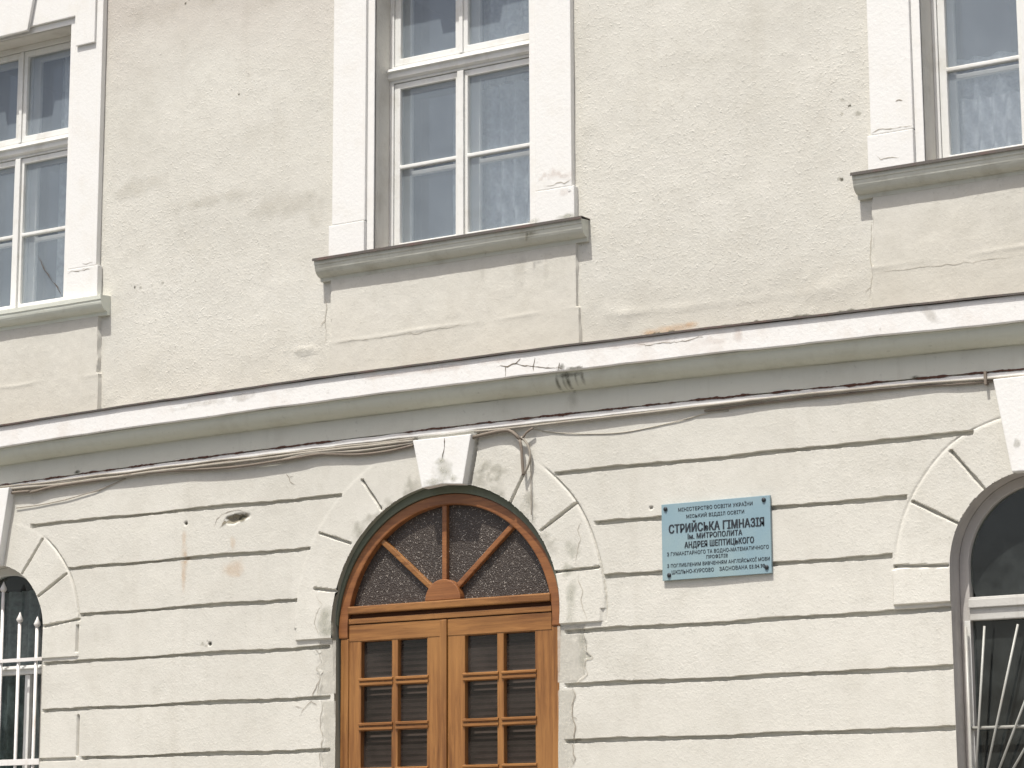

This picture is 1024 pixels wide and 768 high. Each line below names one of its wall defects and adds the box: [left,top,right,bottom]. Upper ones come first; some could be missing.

crack [865,224,1016,293]
crack [500,359,562,376]
crack [403,368,1024,457]
spalling [216,510,248,525]